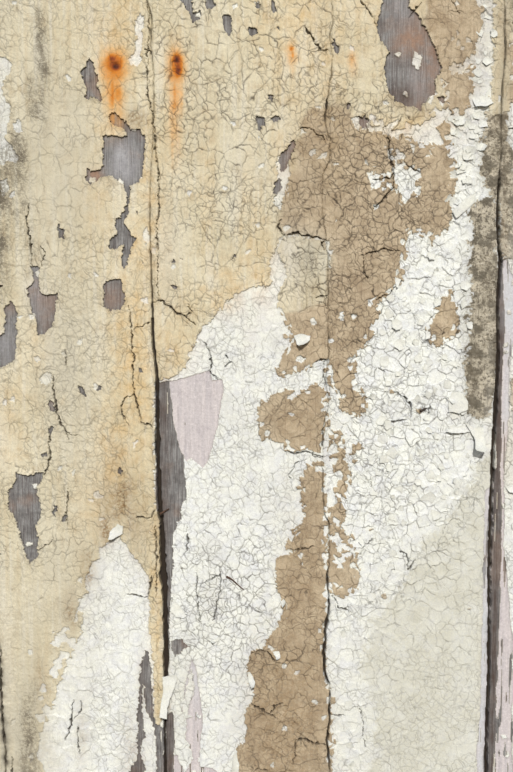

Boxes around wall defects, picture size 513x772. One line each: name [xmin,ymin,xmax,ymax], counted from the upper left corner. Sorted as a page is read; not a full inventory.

rust [93,38,136,138]
peeling [85,113,150,269]
crack [154,127,193,318]
rust [162,38,191,175]
crack [372,134,421,210]
peeling [27,266,58,336]
crack [120,305,155,429]
crack [277,0,368,772]
peeling [329,0,513,772]
peeling [7,472,44,565]
crack [126,510,222,623]
peeling [36,235,331,772]